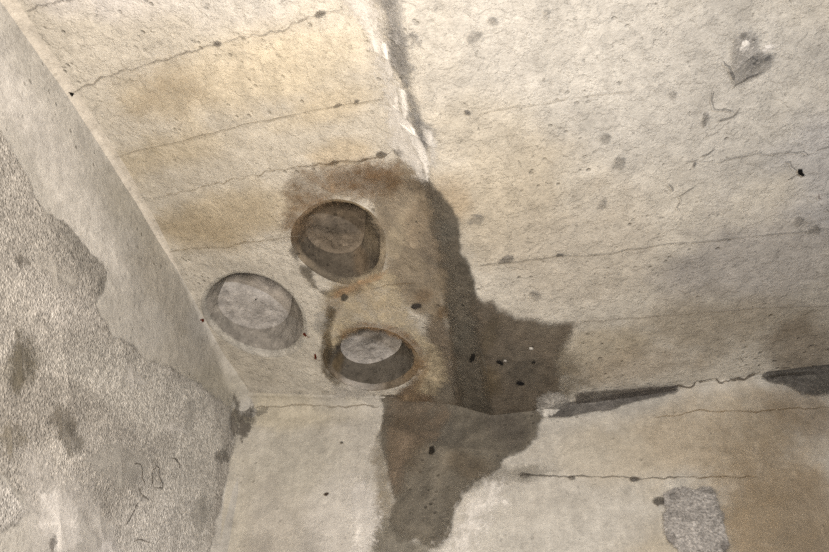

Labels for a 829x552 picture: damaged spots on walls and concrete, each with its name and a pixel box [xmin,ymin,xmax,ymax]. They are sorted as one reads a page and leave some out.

spalling [733,32,772,81]
water stain [291,245,369,301]
water stain [346,0,584,552]
peeling [0,133,235,552]
crack [674,372,760,388]
water stain [231,396,262,442]
crack [660,407,829,417]
crack [518,472,754,481]
spalling [654,486,730,552]